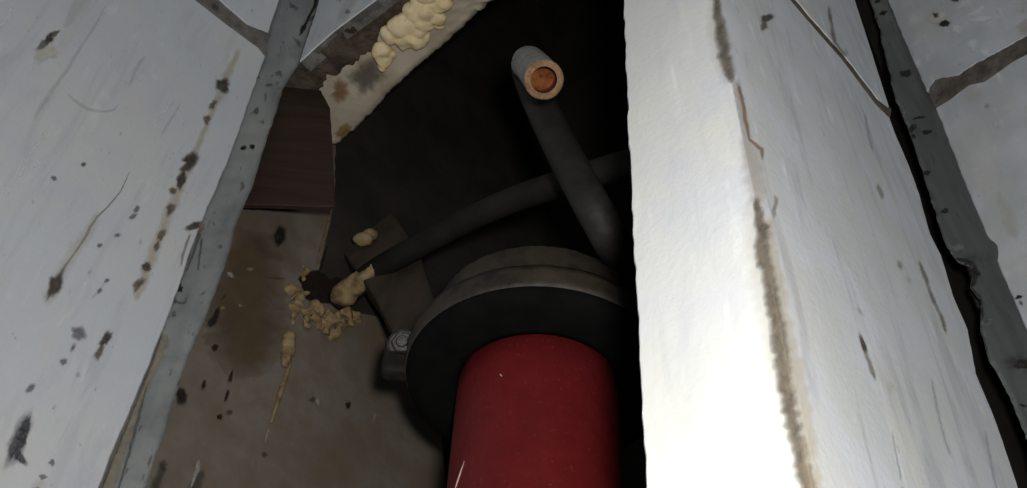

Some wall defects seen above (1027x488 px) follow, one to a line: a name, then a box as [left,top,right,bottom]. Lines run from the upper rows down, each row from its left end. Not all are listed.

damp [714,0,734,80]
rust [204,79,228,124]
rust [167,153,198,214]
rust [133,262,151,291]
damp [754,199,815,488]